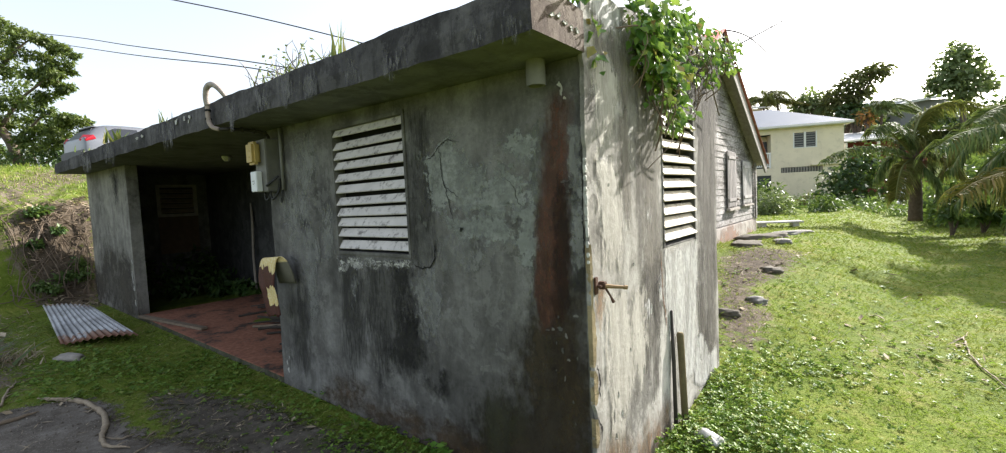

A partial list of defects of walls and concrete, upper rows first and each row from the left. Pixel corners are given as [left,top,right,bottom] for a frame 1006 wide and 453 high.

leakage [254,70,317,112]
crack [426,139,458,219]
peeling [410,128,542,341]
leakage [463,143,592,453]
corrosion [535,94,571,330]
leakage [589,7,718,396]